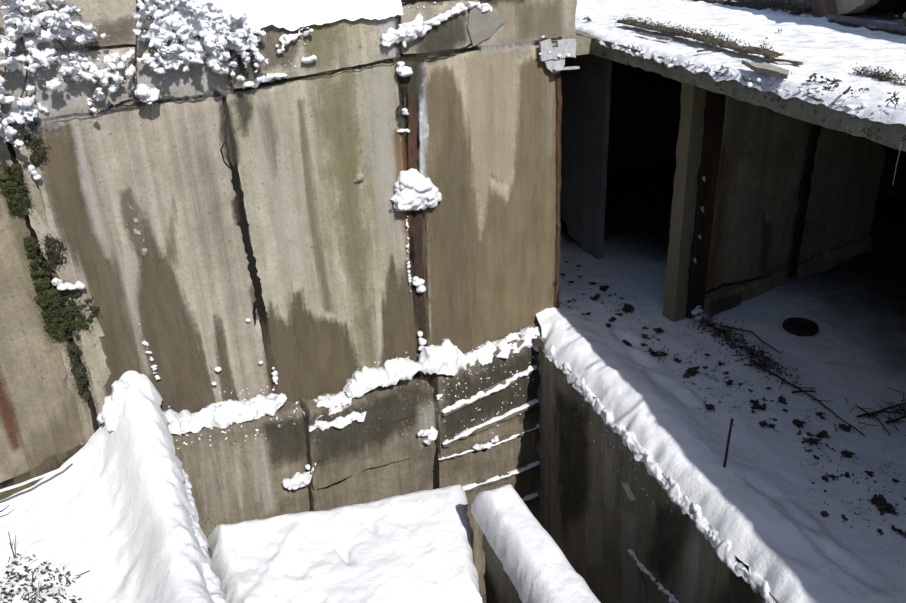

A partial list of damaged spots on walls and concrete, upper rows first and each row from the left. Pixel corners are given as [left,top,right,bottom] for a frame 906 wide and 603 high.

water stain [38,123,238,414]
crack [0,37,562,432]
water stain [426,51,559,353]
corrosion [554,73,562,308]
corrosion [0,380,19,449]
crack [317,459,407,490]
crack [431,447,439,489]